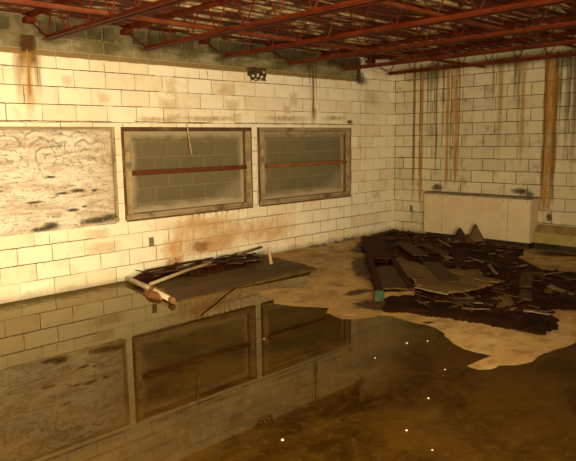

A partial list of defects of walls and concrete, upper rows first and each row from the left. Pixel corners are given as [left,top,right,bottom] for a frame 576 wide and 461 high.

rust [20,34,36,97]
rust [413,65,423,198]
water stain [425,64,445,122]
rust [445,63,461,180]
rust [541,53,559,209]
water stain [559,50,576,121]